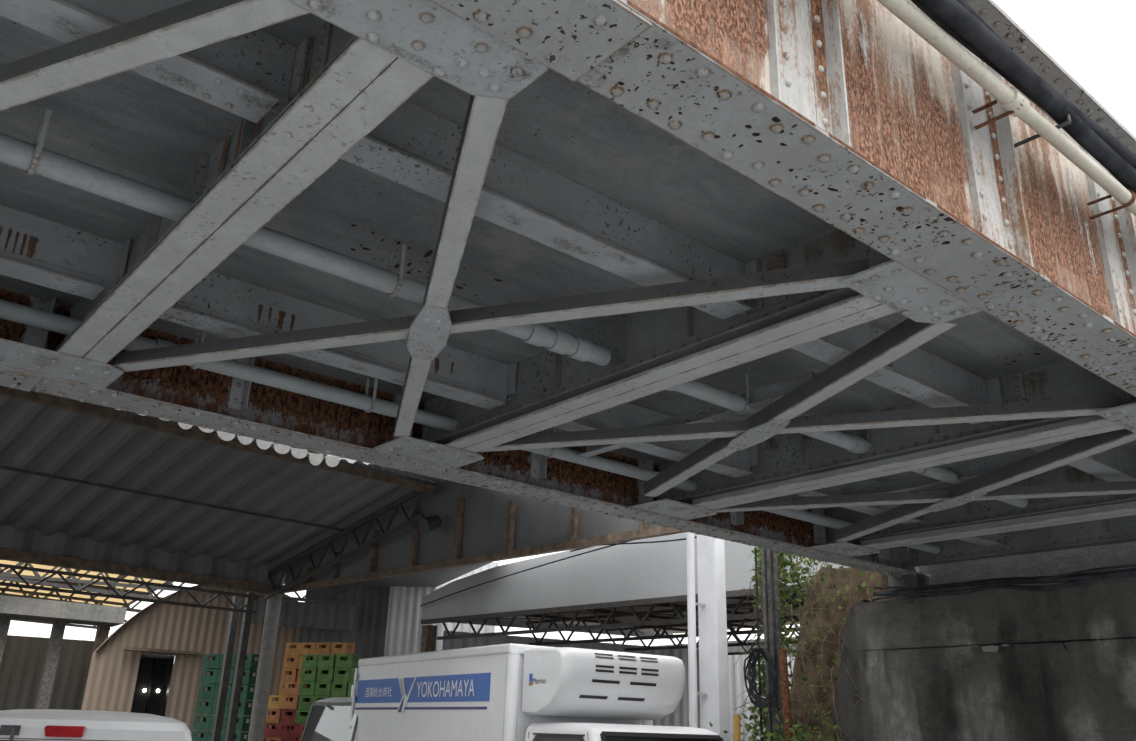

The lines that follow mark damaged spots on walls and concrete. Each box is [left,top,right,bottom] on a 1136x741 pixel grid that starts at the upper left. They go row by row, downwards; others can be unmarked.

corrosion [628,0,816,127]
corrosion [811,0,829,110]
corrosion [829,29,1136,337]
corrosion [0,318,27,343]
corrosion [107,349,229,402]
corrosion [254,357,395,402]
corrosion [248,382,396,441]
corrosion [476,450,531,474]
corrosion [546,446,639,498]
corrosion [711,509,814,541]
water stain [868,642,916,741]
water stain [1093,620,1136,706]